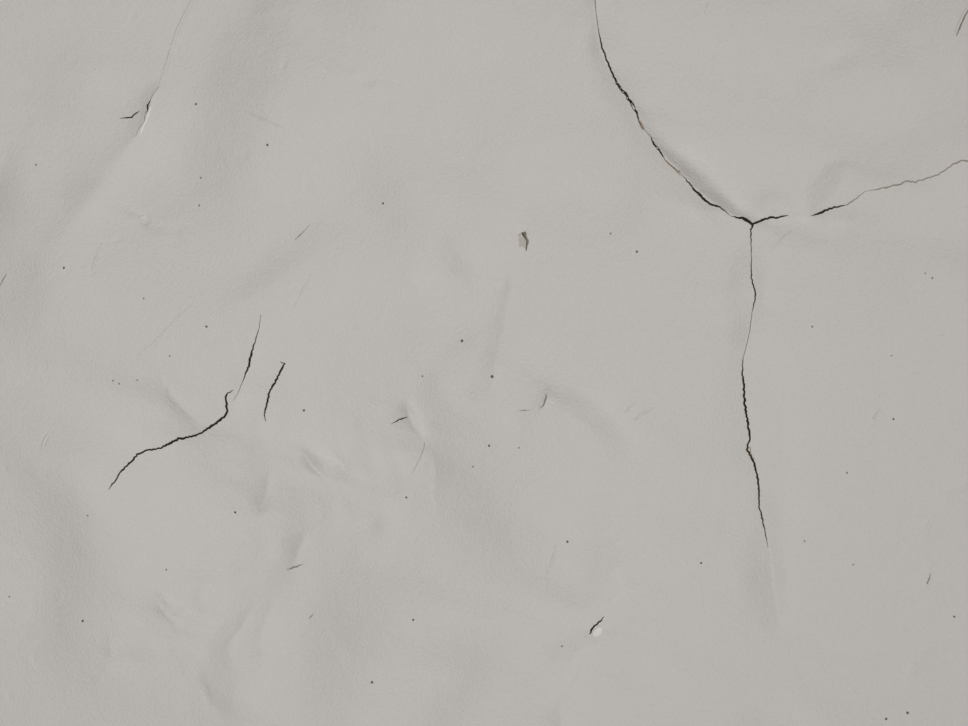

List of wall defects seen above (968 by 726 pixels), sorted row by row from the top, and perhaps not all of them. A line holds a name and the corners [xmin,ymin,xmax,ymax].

crack [595,2,788,545]
crack [812,160,968,216]
crack [109,316,261,489]
crack [264,361,286,421]